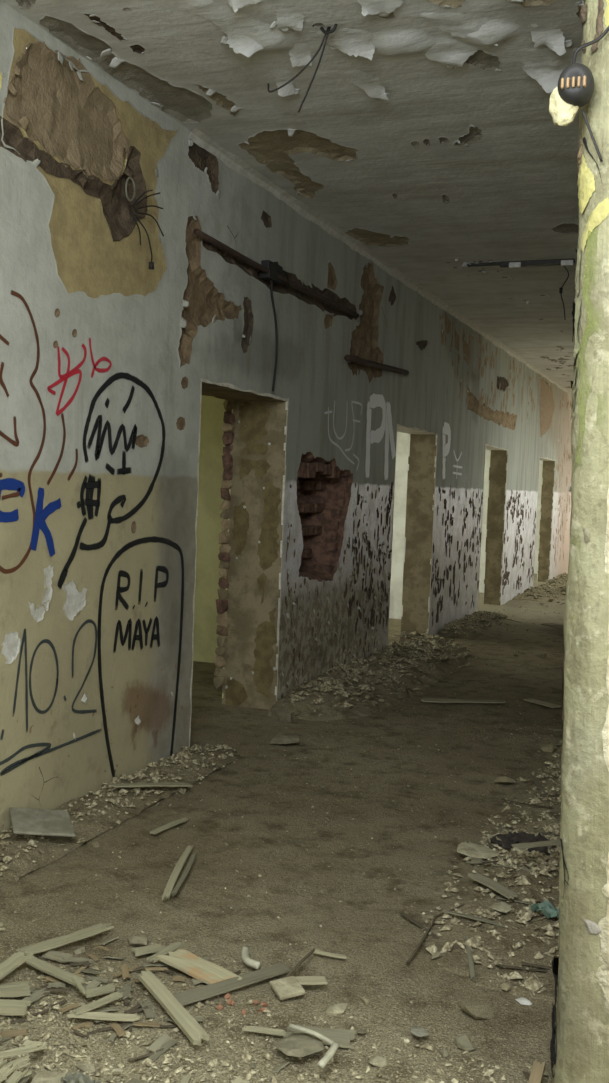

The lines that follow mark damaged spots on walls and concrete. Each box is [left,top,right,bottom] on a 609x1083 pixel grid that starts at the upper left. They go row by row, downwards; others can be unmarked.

peeling [176,0,389,101]
peeling [519,0,609,93]
flaking render [0,0,243,300]
flaking render [236,128,359,199]
flaking render [345,227,411,247]
flaking render [415,133,609,579]
peeling [0,630,21,665]
peeling [28,564,89,626]
flaking render [171,213,396,747]
peeling [396,424,484,635]
flaking render [485,444,538,605]
flaking render [584,853,609,1013]